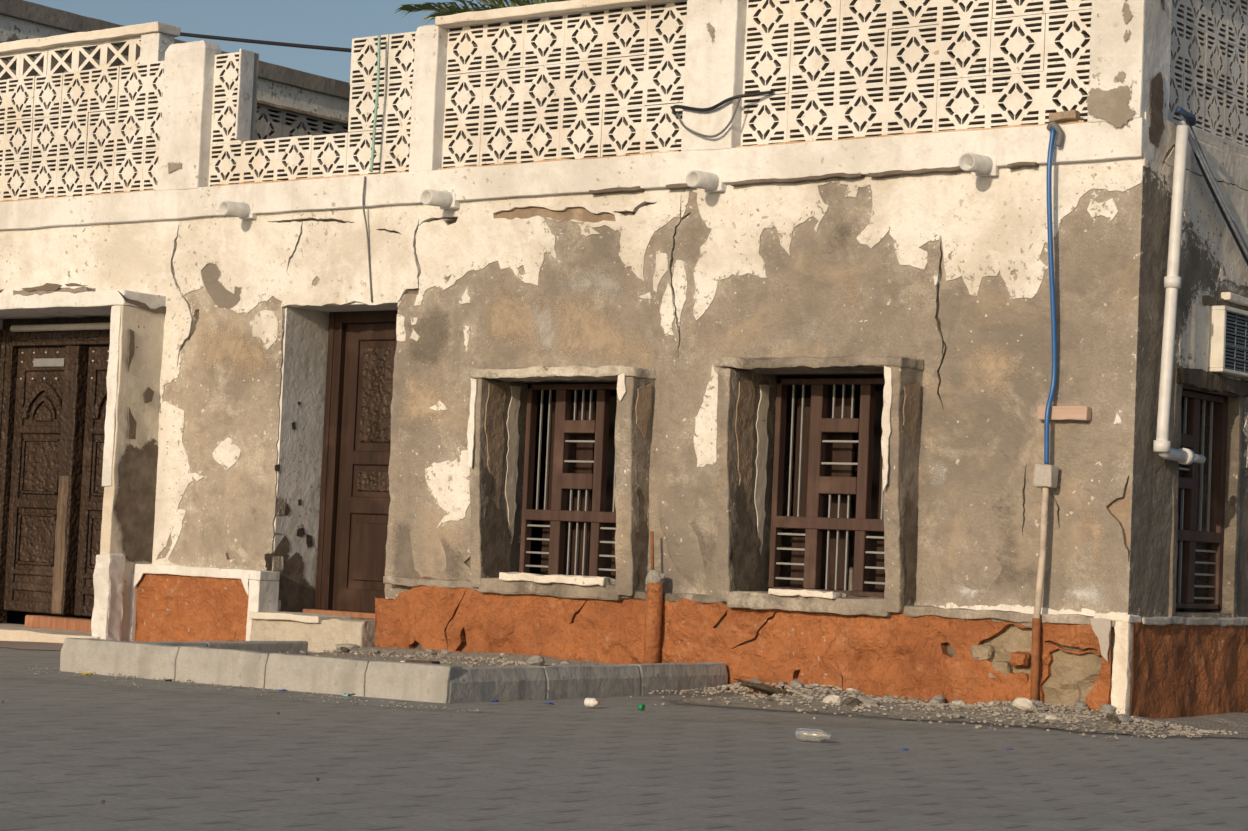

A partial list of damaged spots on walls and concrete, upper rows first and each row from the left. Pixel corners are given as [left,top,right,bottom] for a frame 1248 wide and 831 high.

peeling [1086,71,1165,147]
peeling [115,263,315,612]
peeling [384,166,1248,710]